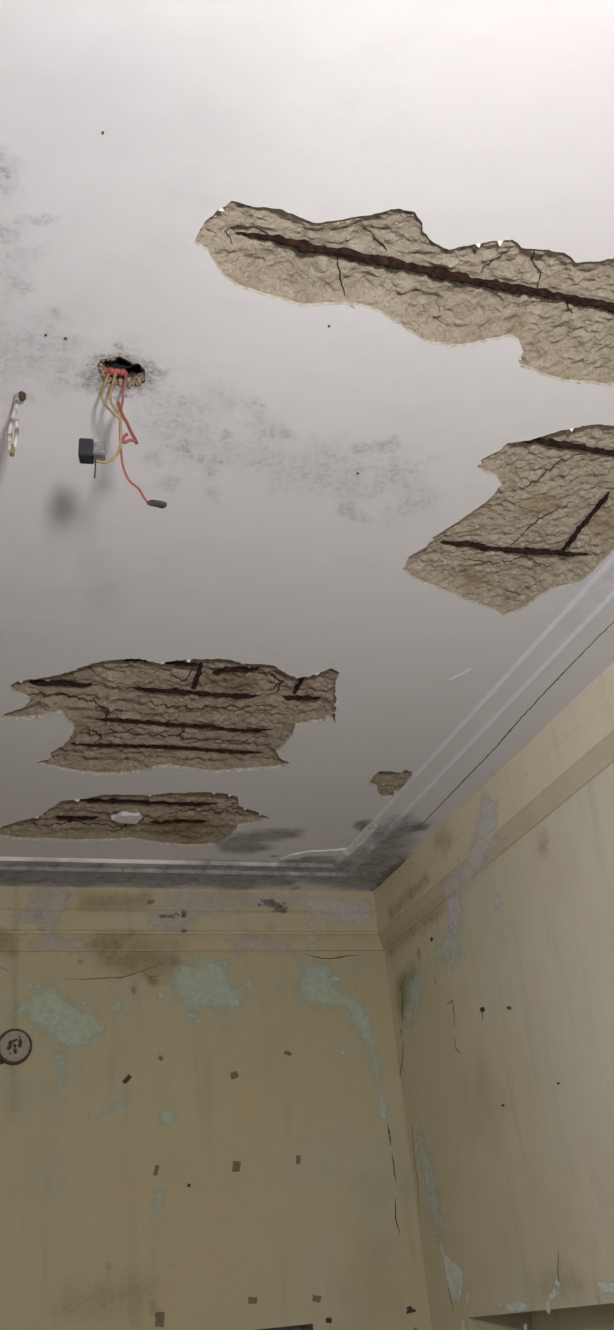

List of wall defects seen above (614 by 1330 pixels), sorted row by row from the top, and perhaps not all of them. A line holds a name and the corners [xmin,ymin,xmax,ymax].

flaking render [194,201,614,386]
flaking render [403,424,614,617]
flaking render [0,658,340,776]
flaking render [0,792,270,847]
flaking render [368,770,412,798]
damp [0,822,423,932]
crack [388,1126,419,1233]